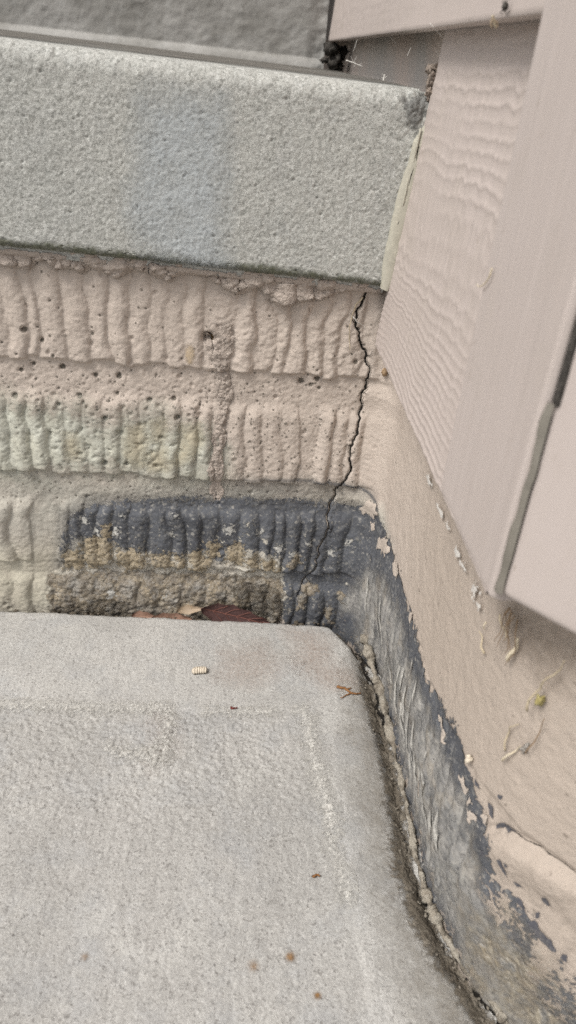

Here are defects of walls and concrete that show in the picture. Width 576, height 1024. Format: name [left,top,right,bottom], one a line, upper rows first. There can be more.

crack [298,292,372,594]
peeling [359,500,398,577]
spalling [46,552,320,624]
spalling [323,591,345,623]
peeling [458,775,516,833]
peeling [496,859,567,962]